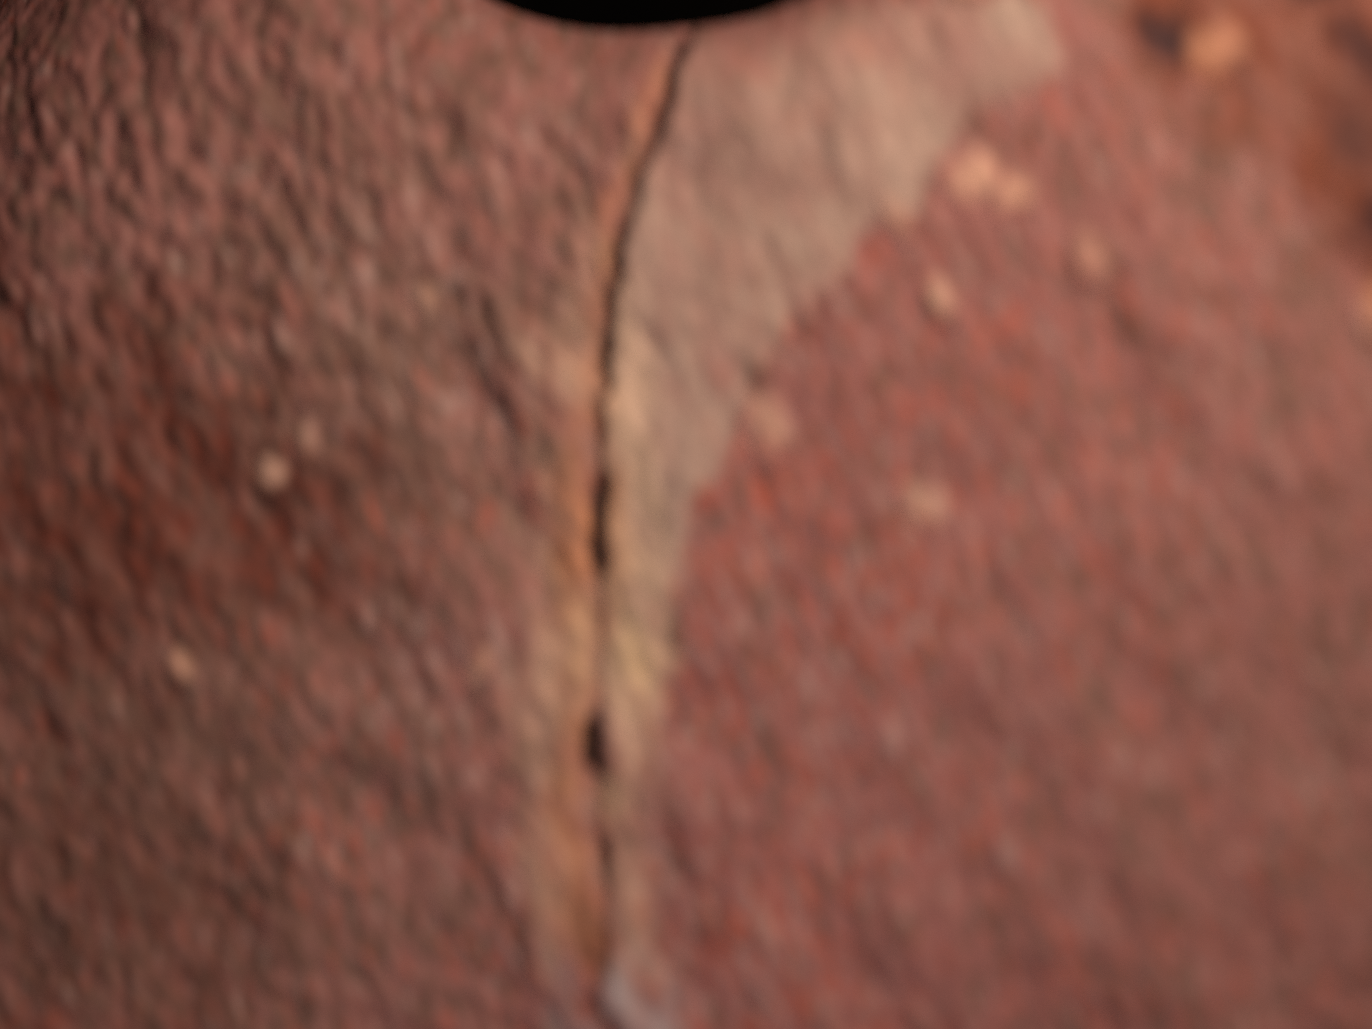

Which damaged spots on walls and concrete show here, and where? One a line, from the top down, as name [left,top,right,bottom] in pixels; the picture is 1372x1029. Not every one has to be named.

peeling [938,143,1043,216]
peeling [923,272,965,321]
peeling [735,379,800,463]
rust [527,43,690,979]
crack [579,37,695,1029]
peeling [896,477,955,529]